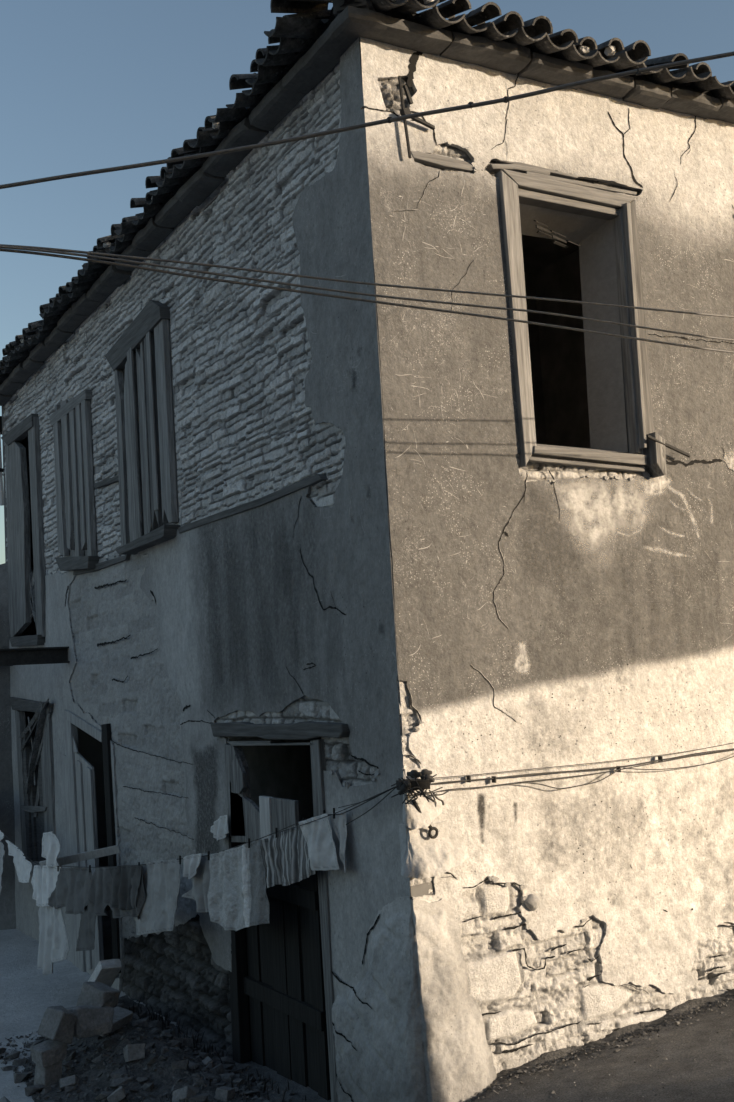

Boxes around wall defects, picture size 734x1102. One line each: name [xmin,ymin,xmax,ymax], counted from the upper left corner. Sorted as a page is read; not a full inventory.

flaking render [378,77,415,115]
flaking render [415,142,498,176]
crack [491,76,518,150]
flaking render [575,178,640,196]
crack [608,111,643,188]
crack [670,116,697,200]
crack [666,449,733,471]
peeling [0,62,346,1102]
crack [493,469,560,629]
water stain [524,476,683,576]
flaking render [321,737,380,788]
flaking render [460,876,734,1100]